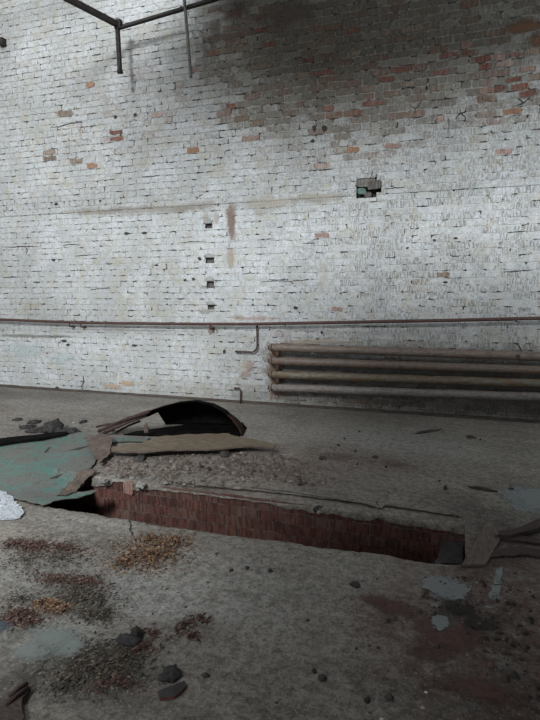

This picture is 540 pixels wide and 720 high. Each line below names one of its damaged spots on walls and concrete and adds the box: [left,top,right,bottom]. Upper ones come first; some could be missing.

peeling [441,41,540,102]
peeling [226,103,264,126]
flaking render [109,130,123,141]
flaking render [43,149,57,162]
flaking render [70,159,98,169]
corrosion [226,205,234,238]
corrosion [269,351,285,399]
spalling [29,482,465,564]